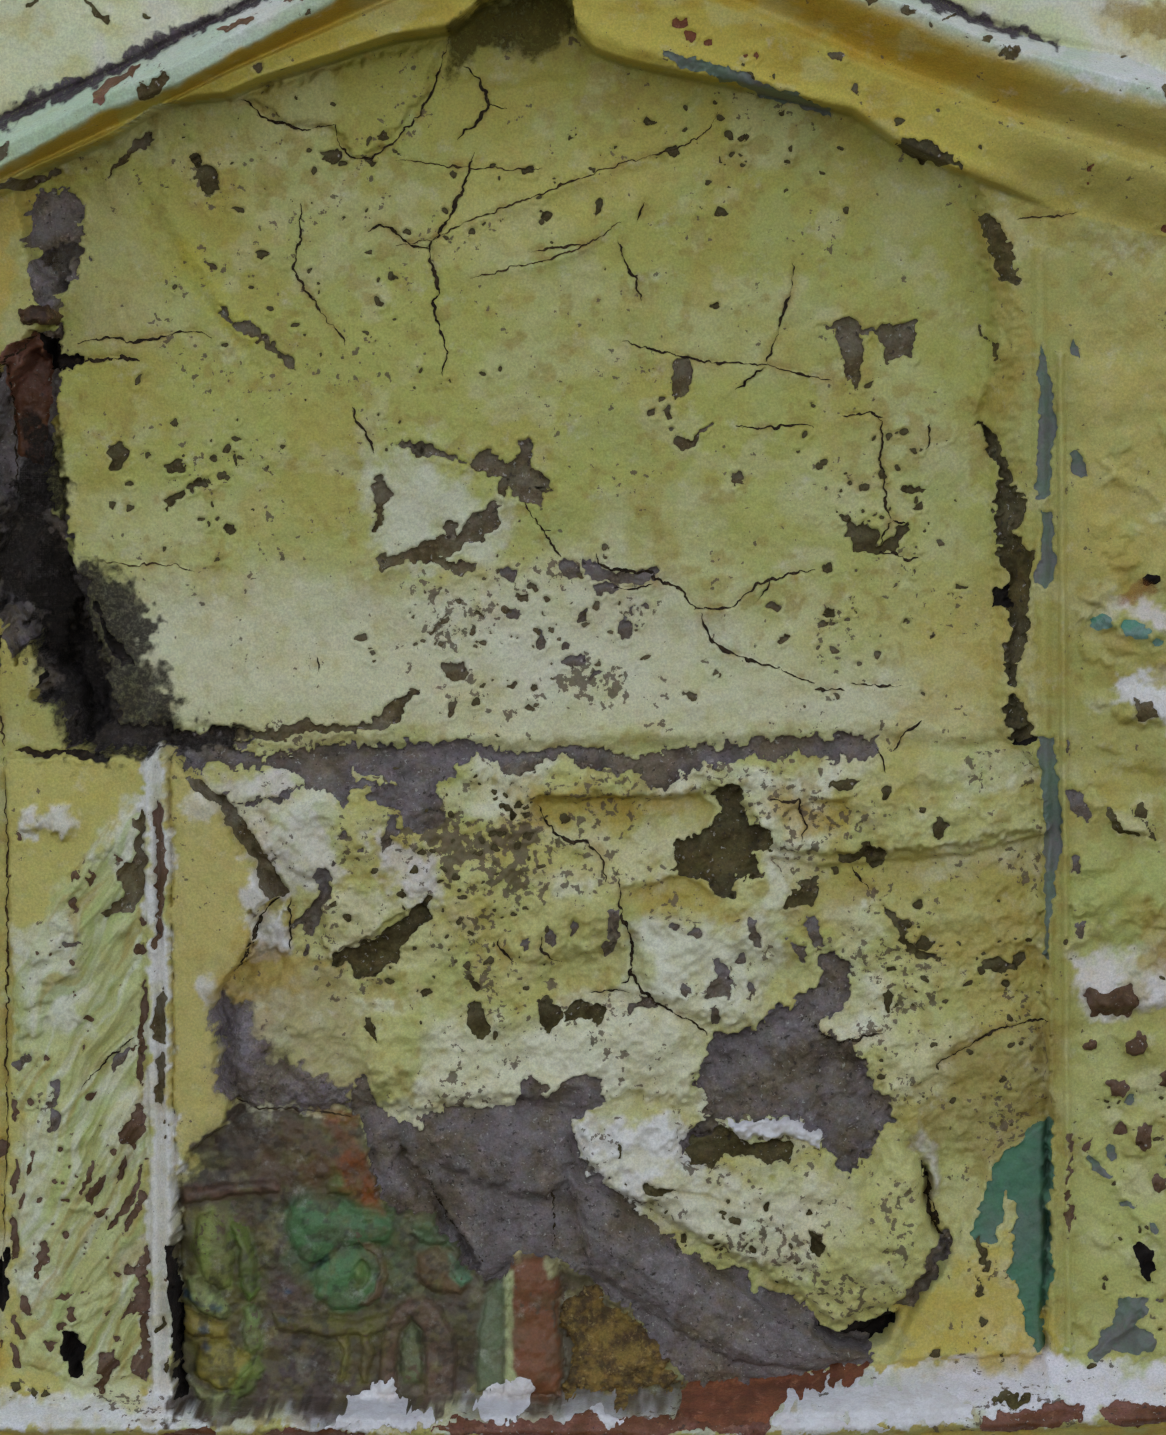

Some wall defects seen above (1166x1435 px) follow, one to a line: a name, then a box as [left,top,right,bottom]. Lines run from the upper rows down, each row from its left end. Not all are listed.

crack [352,407,374,453]
peeling [0,167,879,1043]
crack [241,38,718,375]
crack [626,264,832,390]
crack [596,554,901,692]
crack [736,411,918,562]
crack [876,720,922,773]
spalling [974,421,1038,746]
peeling [11,979,168,1232]
spalling [204,990,953,1435]
spalling [679,841,897,1179]
peeling [980,1389,1166,1433]